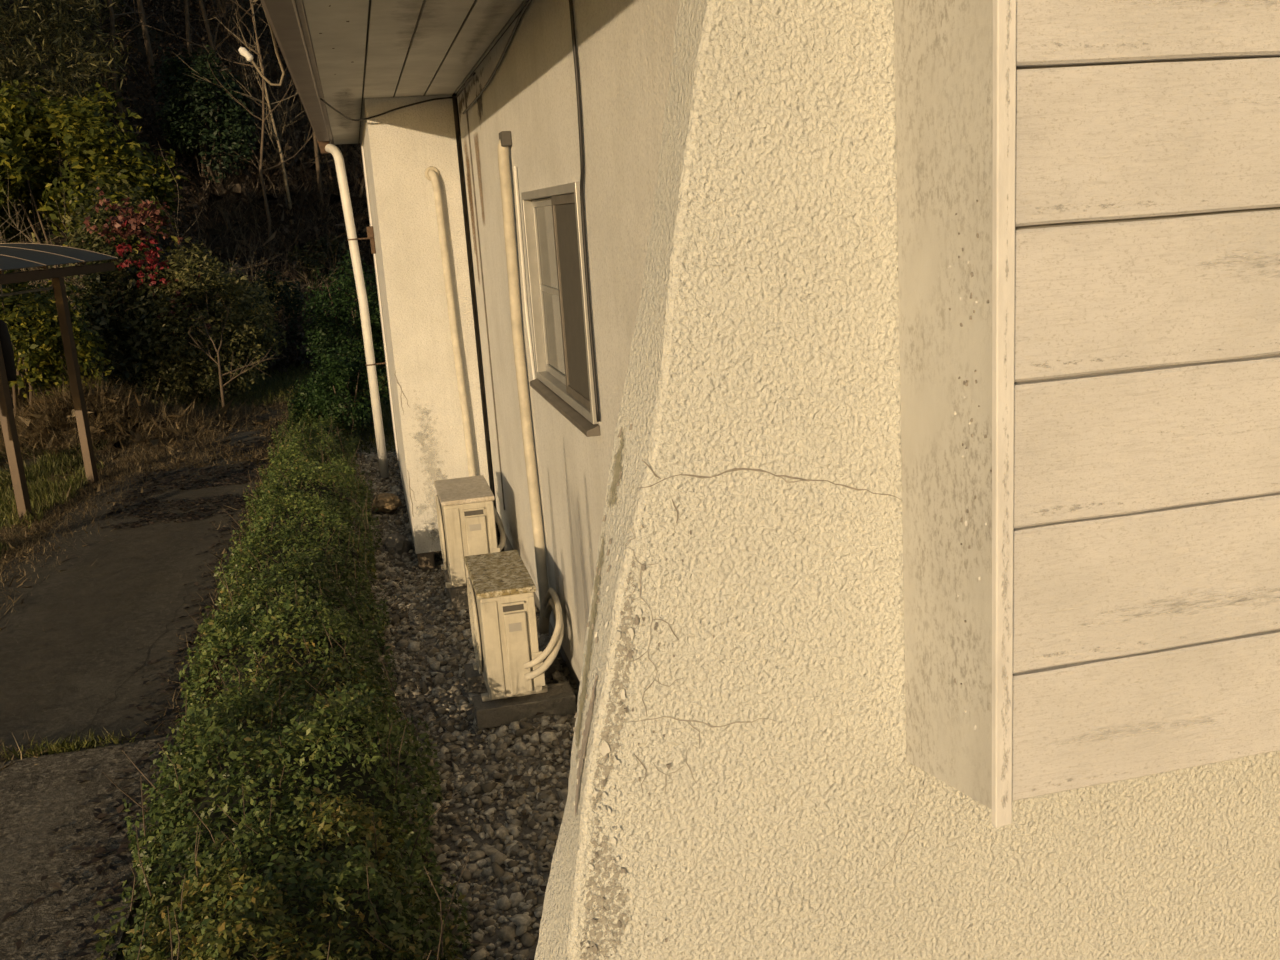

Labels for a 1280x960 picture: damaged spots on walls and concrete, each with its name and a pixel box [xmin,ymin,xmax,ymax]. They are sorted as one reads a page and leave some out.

crack [637,460,902,523]
peeling [574,555,646,960]
crack [623,524,775,793]